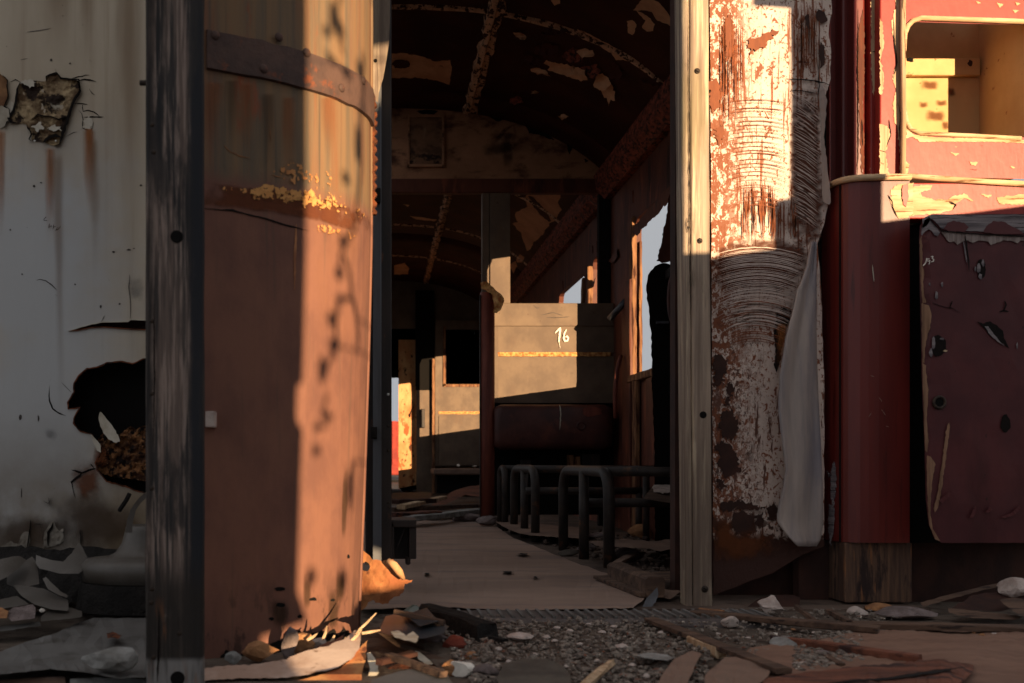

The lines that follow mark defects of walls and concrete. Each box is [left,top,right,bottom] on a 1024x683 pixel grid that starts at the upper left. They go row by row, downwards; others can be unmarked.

peeling [0,59,101,146]
peeling [392,53,452,85]
peeling [513,28,637,103]
peeling [627,0,670,35]
peeling [709,78,723,113]
peeling [714,125,725,145]
peeling [721,15,735,61]
peeling [747,28,779,55]
peeling [857,0,1024,219]
corrosion [215,159,365,239]
peeling [713,242,837,546]
peeling [934,424,950,512]